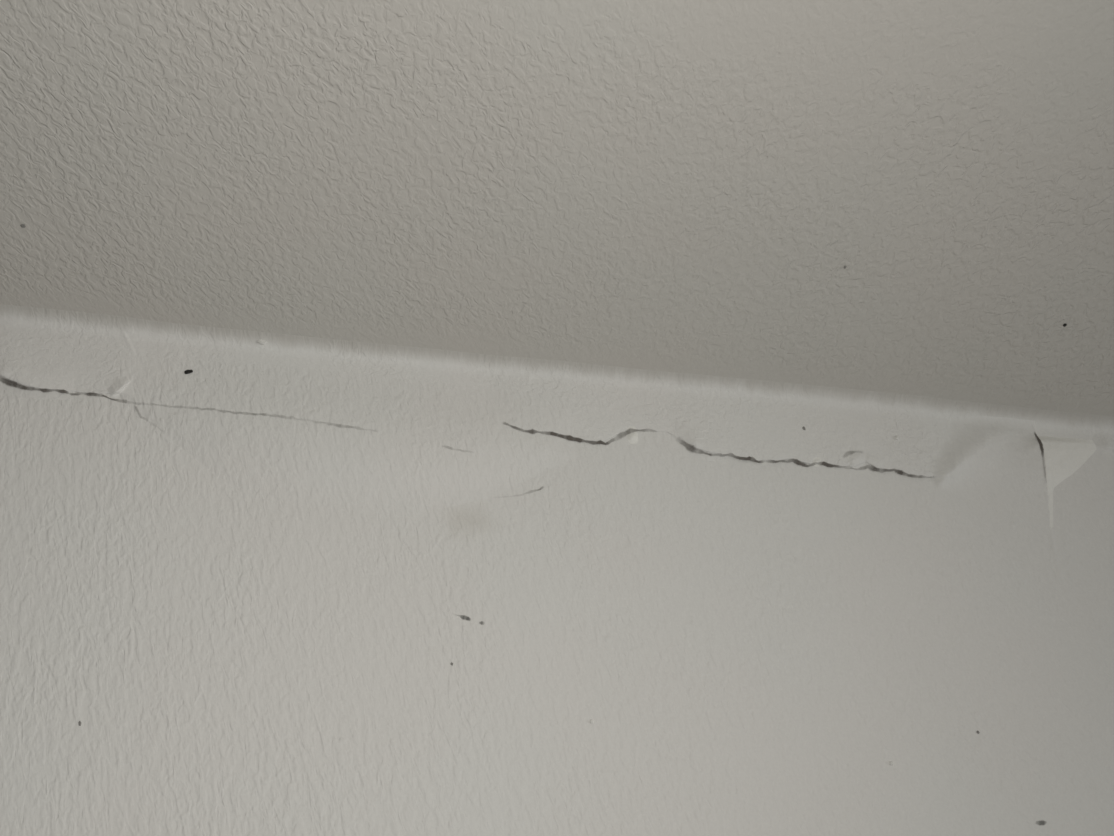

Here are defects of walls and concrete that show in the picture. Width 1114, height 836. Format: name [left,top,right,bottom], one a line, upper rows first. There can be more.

crack [0,334,114,400]
crack [512,426,638,445]
crack [671,419,913,477]